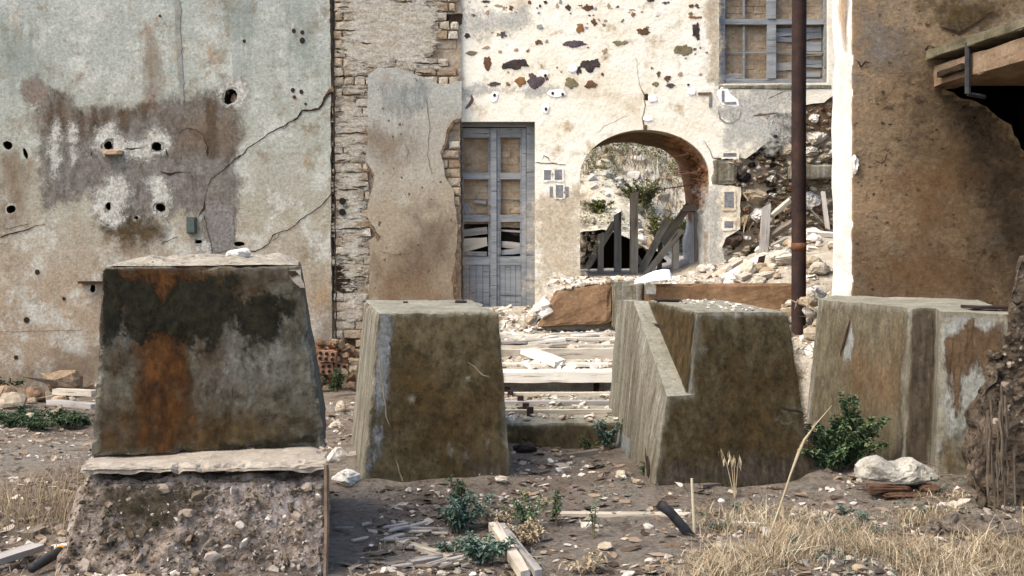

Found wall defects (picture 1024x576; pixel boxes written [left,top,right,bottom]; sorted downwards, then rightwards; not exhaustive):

flaking render [446,0,670,90]
flaking render [674,4,708,59]
flaking render [650,67,703,89]
water stain [20,77,243,254]
crack [160,0,337,339]
spalling [440,119,461,157]
flaking render [713,113,791,263]
flaking render [806,96,833,165]
flaking render [806,179,833,232]
corrosion [117,267,214,306]
spalling [336,257,357,294]